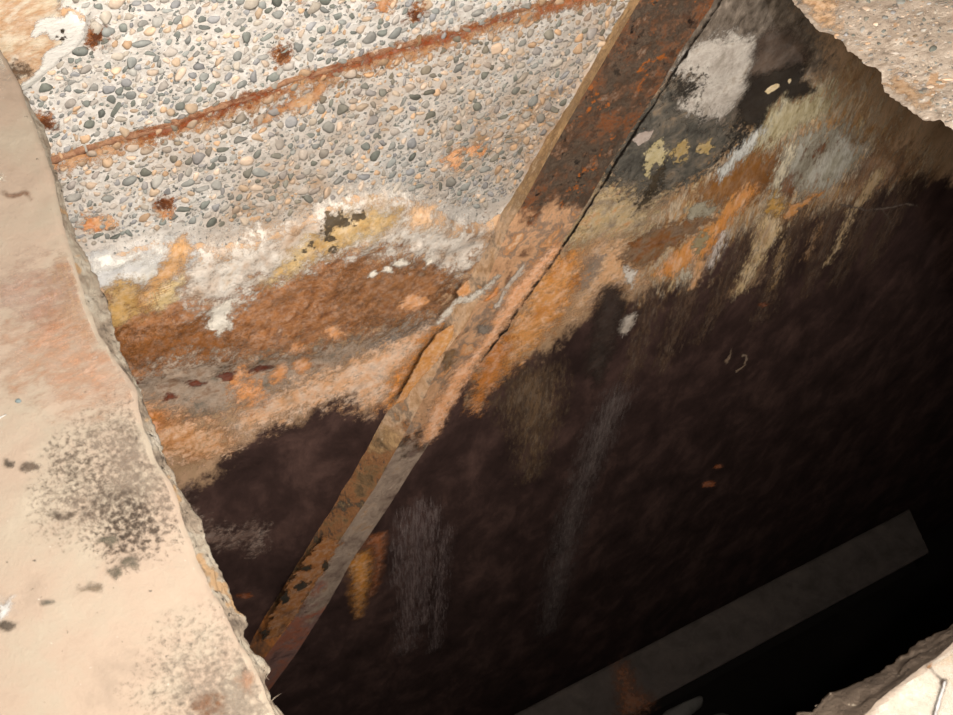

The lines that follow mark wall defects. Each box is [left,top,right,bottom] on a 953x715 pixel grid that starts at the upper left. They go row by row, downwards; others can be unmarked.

corrosion [36,110,59,131]
corrosion [152,194,176,220]
corrosion [53,0,611,173]
crack [480,0,722,363]
leakage [554,27,943,333]
corrosion [112,239,479,468]
leakage [86,173,525,429]
leakage [492,360,567,479]
leakage [177,482,270,559]
leakage [390,499,453,655]
spalling [795,624,953,715]
leakage [876,657,953,715]